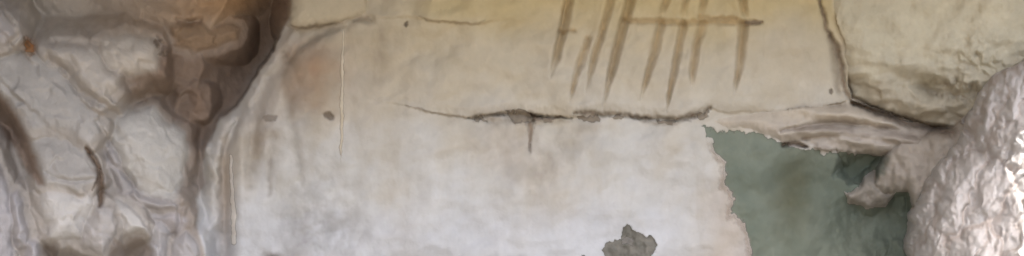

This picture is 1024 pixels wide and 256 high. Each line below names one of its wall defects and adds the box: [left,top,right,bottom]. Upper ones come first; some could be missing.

crack [475,108,709,125]
peeling [703,125,912,256]
spalling [602,224,657,256]